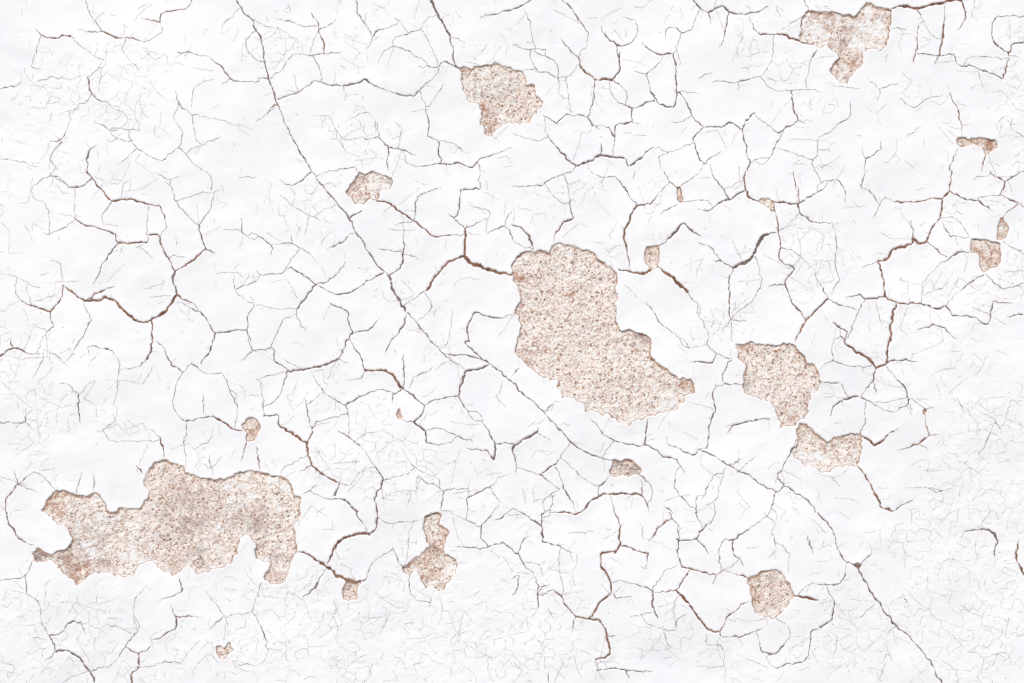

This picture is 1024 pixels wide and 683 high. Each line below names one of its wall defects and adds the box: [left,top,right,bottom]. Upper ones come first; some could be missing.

peeling [459,62,543,136]
peeling [799,2,892,84]
crack [890,0,1024,144]
crack [467,201,547,251]
crack [653,222,700,247]
peeling [511,243,695,426]
peeling [736,341,863,473]
crack [2,452,59,545]
peeling [32,459,301,586]
peeling [402,512,458,591]
crack [857,466,913,512]
crack [0,559,218,683]